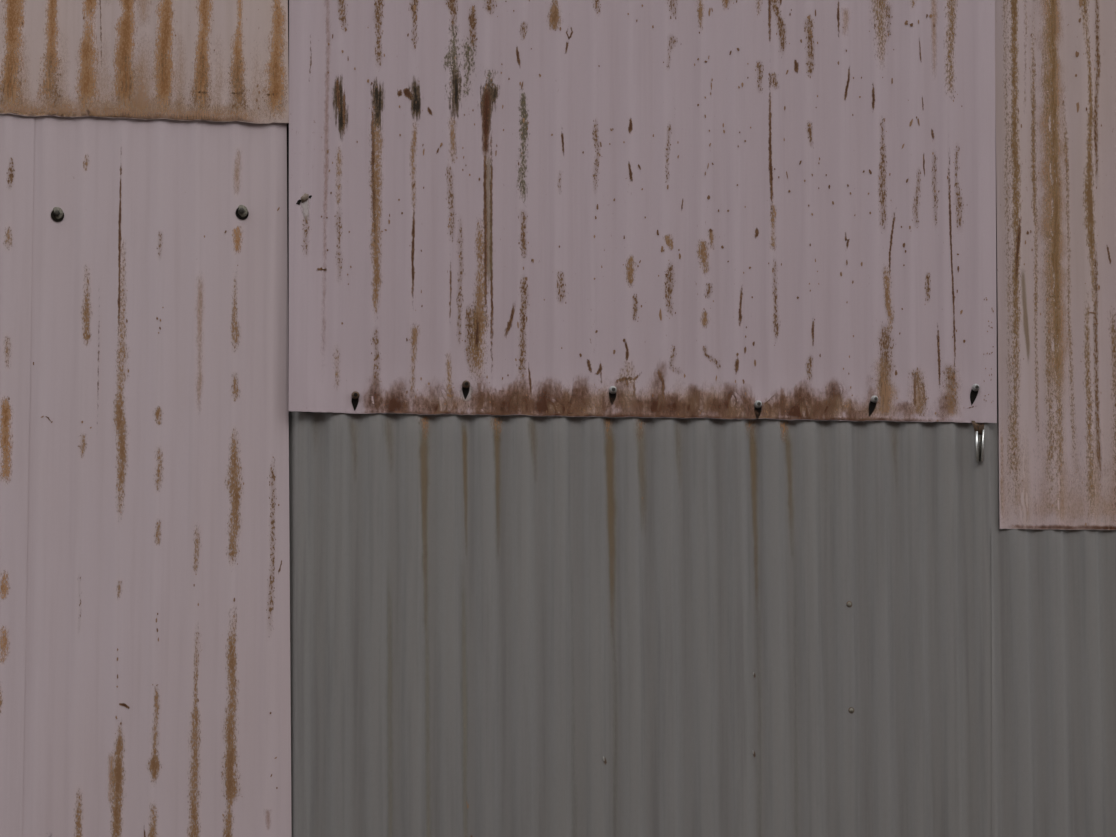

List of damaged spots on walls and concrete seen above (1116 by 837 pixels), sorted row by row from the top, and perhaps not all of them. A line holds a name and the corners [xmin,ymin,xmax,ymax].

rust [0,0,287,121]
rust [446,0,514,95]
rust [869,0,962,107]
rust [0,398,12,480]
rust [113,167,129,512]
rust [225,429,244,565]
rust [367,118,992,440]
rust [738,0,818,346]
rust [1004,0,1116,530]
rust [109,703,129,837]
rust [188,633,201,837]
rust [221,616,240,837]